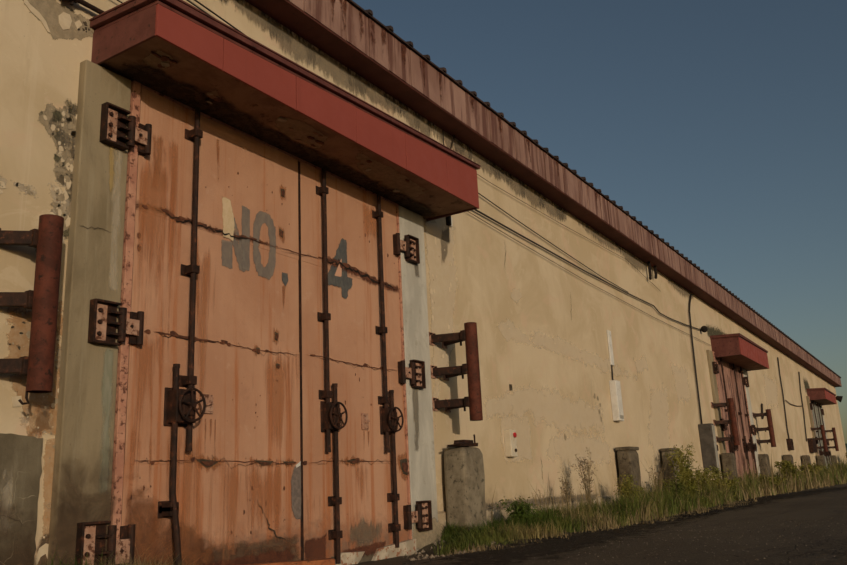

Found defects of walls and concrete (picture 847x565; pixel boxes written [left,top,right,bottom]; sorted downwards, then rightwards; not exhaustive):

peeling [23,0,95,40]
peeling [39,100,77,238]
crack [136,204,399,291]
peeling [5,307,32,359]
crack [144,329,395,372]
peeling [10,301,64,565]
crack [136,455,392,469]
corrosion [201,475,326,565]
corrosion [343,518,386,556]